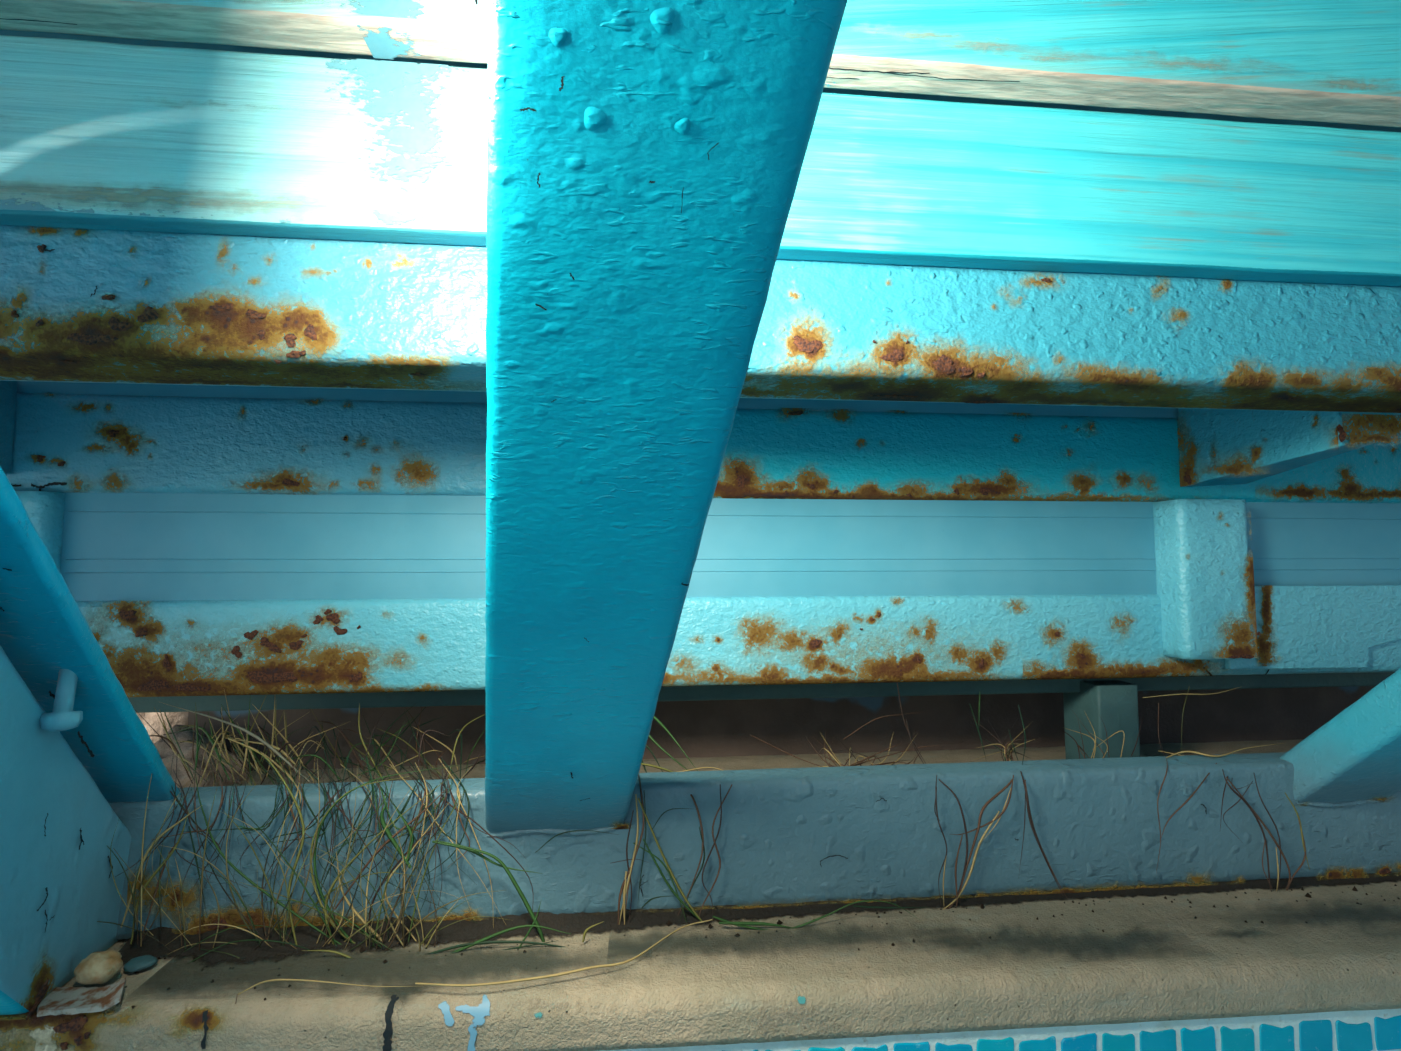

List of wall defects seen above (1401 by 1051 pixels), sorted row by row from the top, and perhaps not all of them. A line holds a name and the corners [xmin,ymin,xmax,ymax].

corrosion [0,278,462,407]
corrosion [741,316,1401,487]
corrosion [242,470,338,495]
corrosion [713,458,1160,502]
corrosion [1263,469,1401,501]
corrosion [92,600,445,697]
corrosion [662,598,1007,686]
corrosion [1018,555,1275,680]
water stain [961,929,1159,957]
water stain [1271,906,1401,923]
corrosion [0,955,137,1051]
crack [382,995,399,1051]